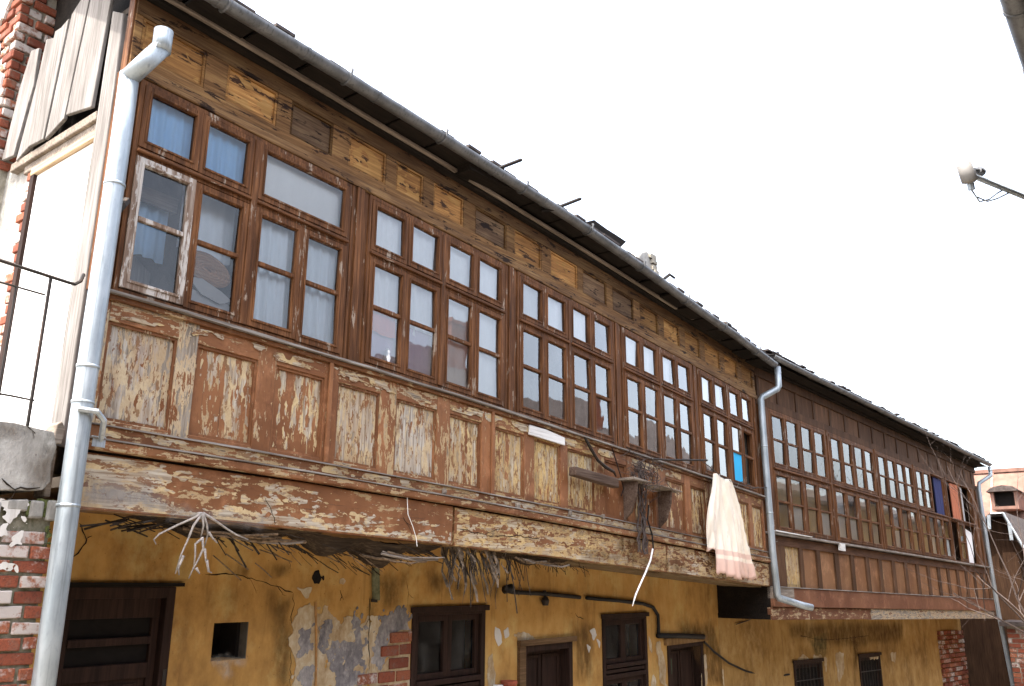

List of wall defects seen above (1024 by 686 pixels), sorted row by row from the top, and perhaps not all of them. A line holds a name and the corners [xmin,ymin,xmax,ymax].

peeling [99,312,189,446]
peeling [186,324,237,340]
peeling [198,350,260,460]
peeling [253,343,433,490]
peeling [81,400,769,585]
peeling [0,562,19,573]
peeling [288,570,412,686]